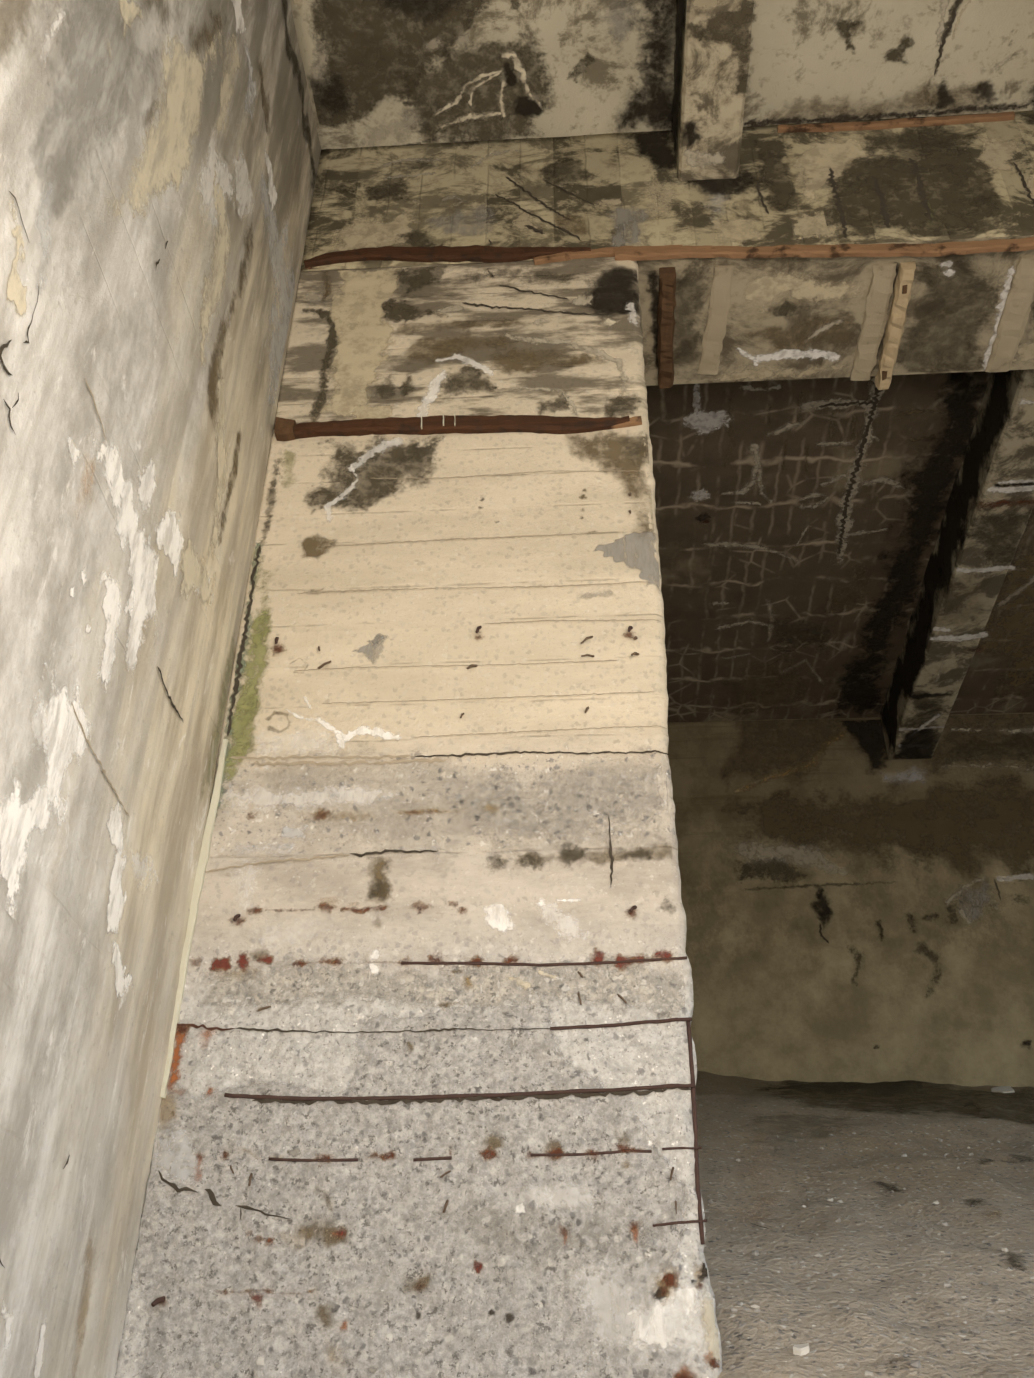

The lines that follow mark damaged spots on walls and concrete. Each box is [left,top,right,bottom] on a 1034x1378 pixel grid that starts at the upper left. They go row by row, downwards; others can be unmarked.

peeling [116,31,240,217]
leakage [282,0,551,188]
crack [934,0,971,76]
peeling [7,191,29,316]
corrosion [304,237,1034,269]
leakage [68,138,339,689]
leakage [305,439,438,514]
corrosion [274,414,642,442]
leakage [0,676,90,918]
corrosion [210,953,274,972]
corrosion [167,1025,209,1087]
spalling [135,956,707,1378]